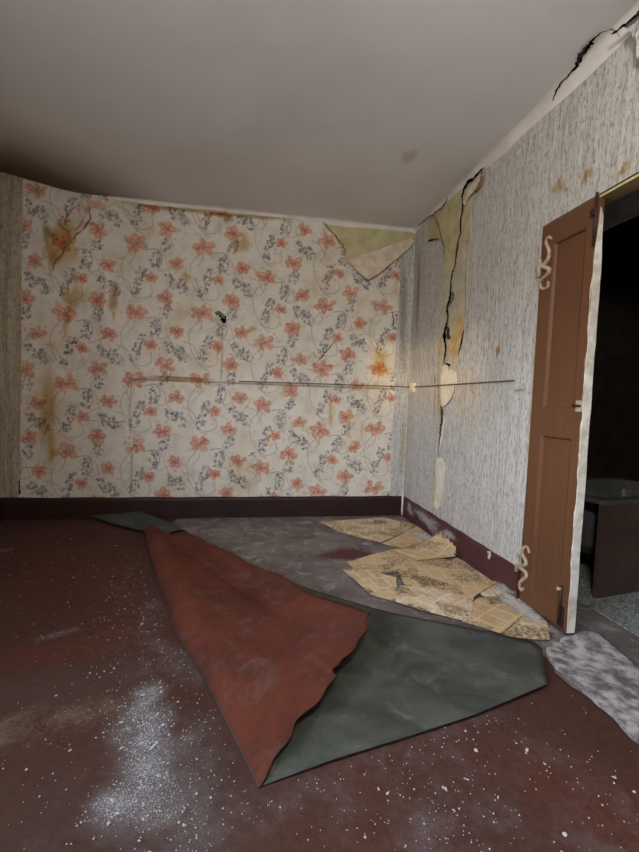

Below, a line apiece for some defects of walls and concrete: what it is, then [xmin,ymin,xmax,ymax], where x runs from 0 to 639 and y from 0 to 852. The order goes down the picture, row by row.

crack [552,10,639,101]
flaking render [429,189,471,265]
crack [419,168,484,369]
flaking render [437,314,465,358]
crack [437,406,445,457]